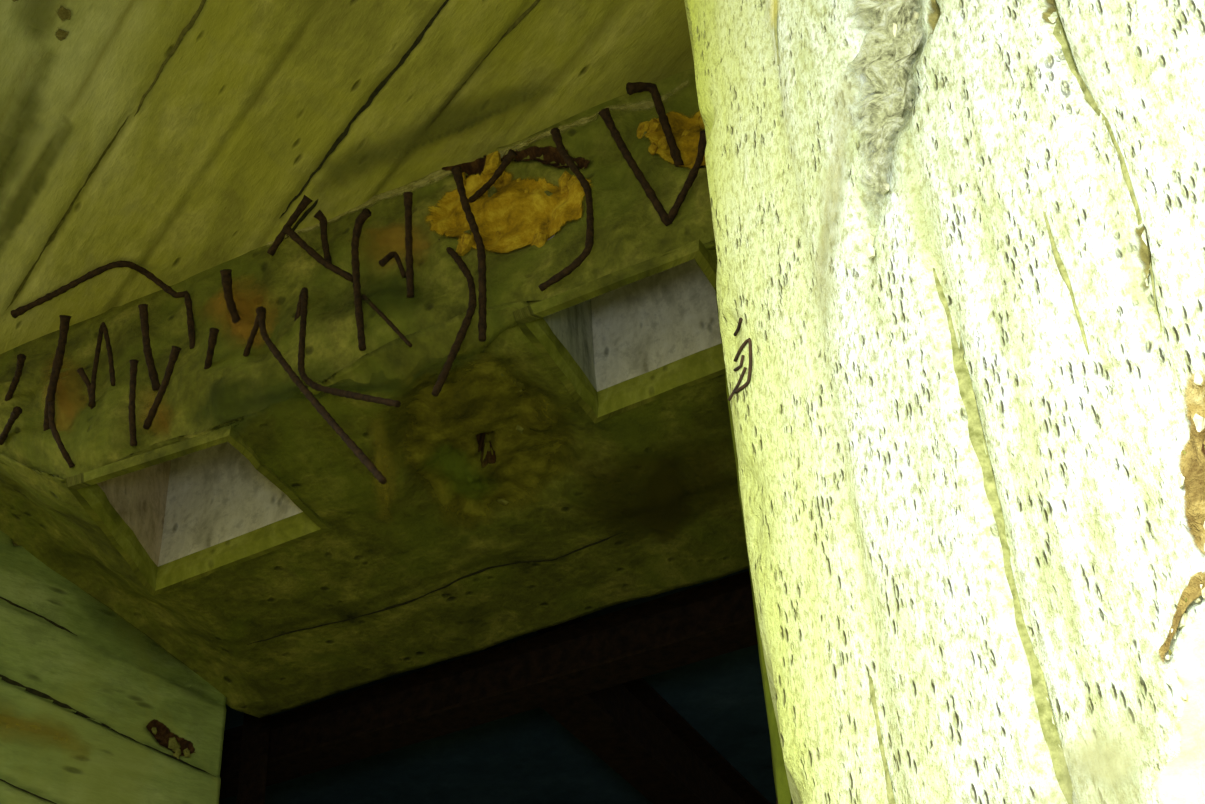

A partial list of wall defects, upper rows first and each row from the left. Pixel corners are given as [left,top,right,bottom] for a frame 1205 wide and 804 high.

leakage [0,139,64,248]
spalling [11,260,219,468]
rust [214,290,260,336]
spalling [220,127,594,526]
spalling [598,82,707,226]
spalling [848,0,941,259]
crack [1043,211,1089,354]
crack [1053,0,1142,225]
crack [1149,256,1162,333]
crack [933,268,1073,804]
spalling [1158,571,1205,662]
spalling [1177,369,1205,554]